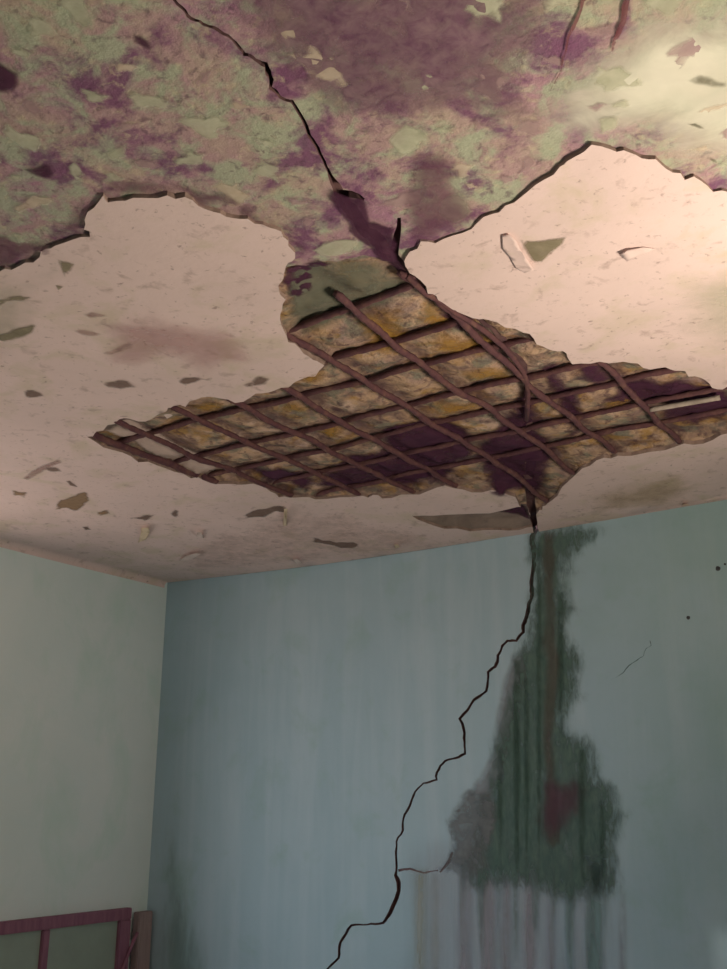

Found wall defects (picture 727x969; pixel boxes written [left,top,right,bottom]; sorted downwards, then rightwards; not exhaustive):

damp [0,65,18,92]
crack [173,0,365,200]
damp [260,0,538,110]
crack [612,0,629,51]
damp [571,29,727,144]
damp [28,166,52,178]
peeling [0,0,727,529]
crack [391,218,409,273]
rust [439,339,490,351]
crack [477,319,532,432]
crack [327,475,538,969]
damp [447,527,620,969]